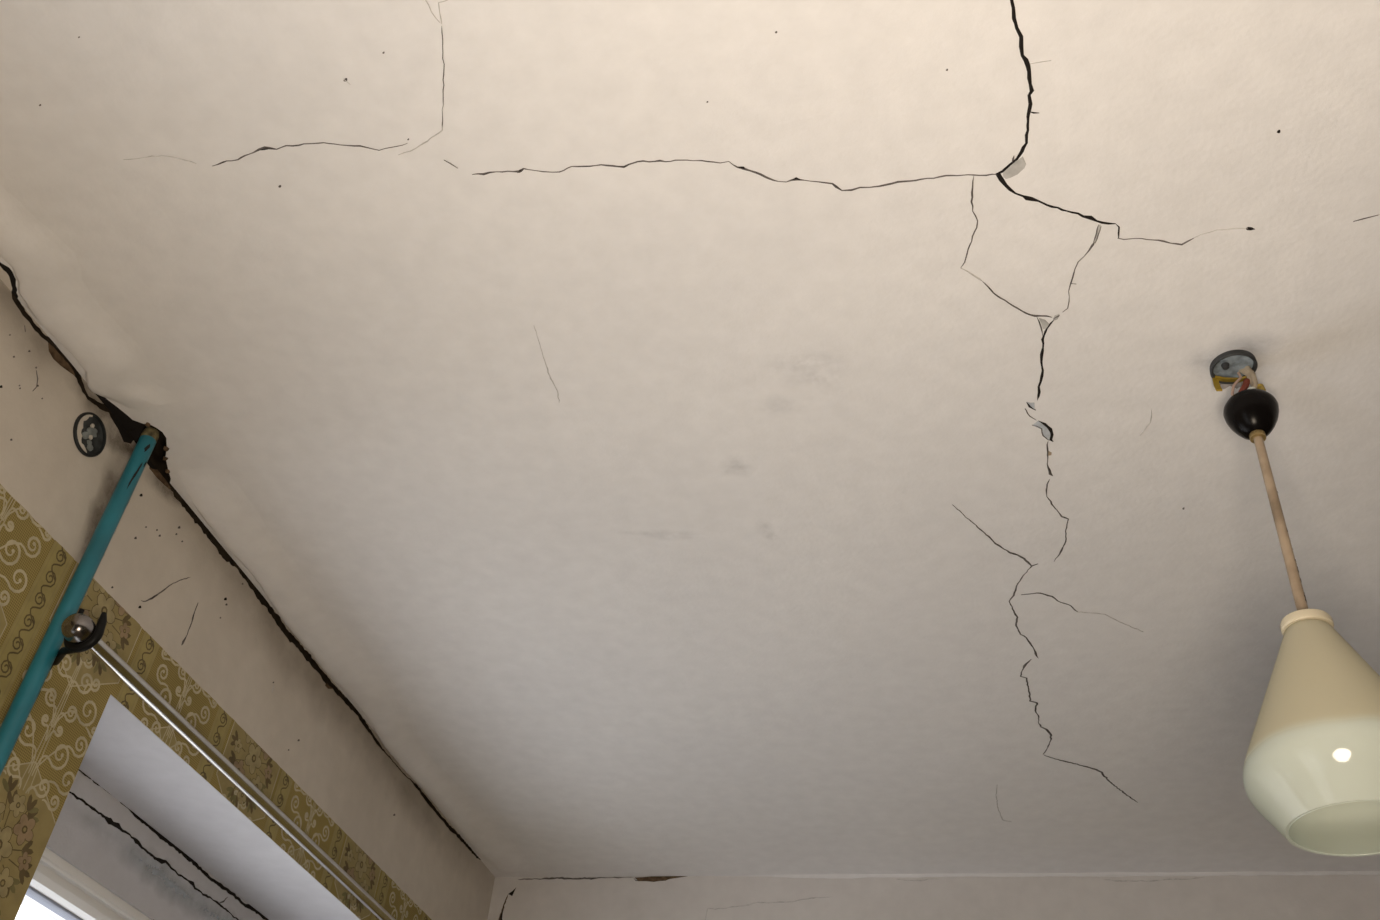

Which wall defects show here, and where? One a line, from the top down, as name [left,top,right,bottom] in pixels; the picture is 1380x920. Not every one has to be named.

crack [69,770,269,920]
crack [0,262,481,860]
crack [499,876,686,920]
crack [123,0,1255,803]